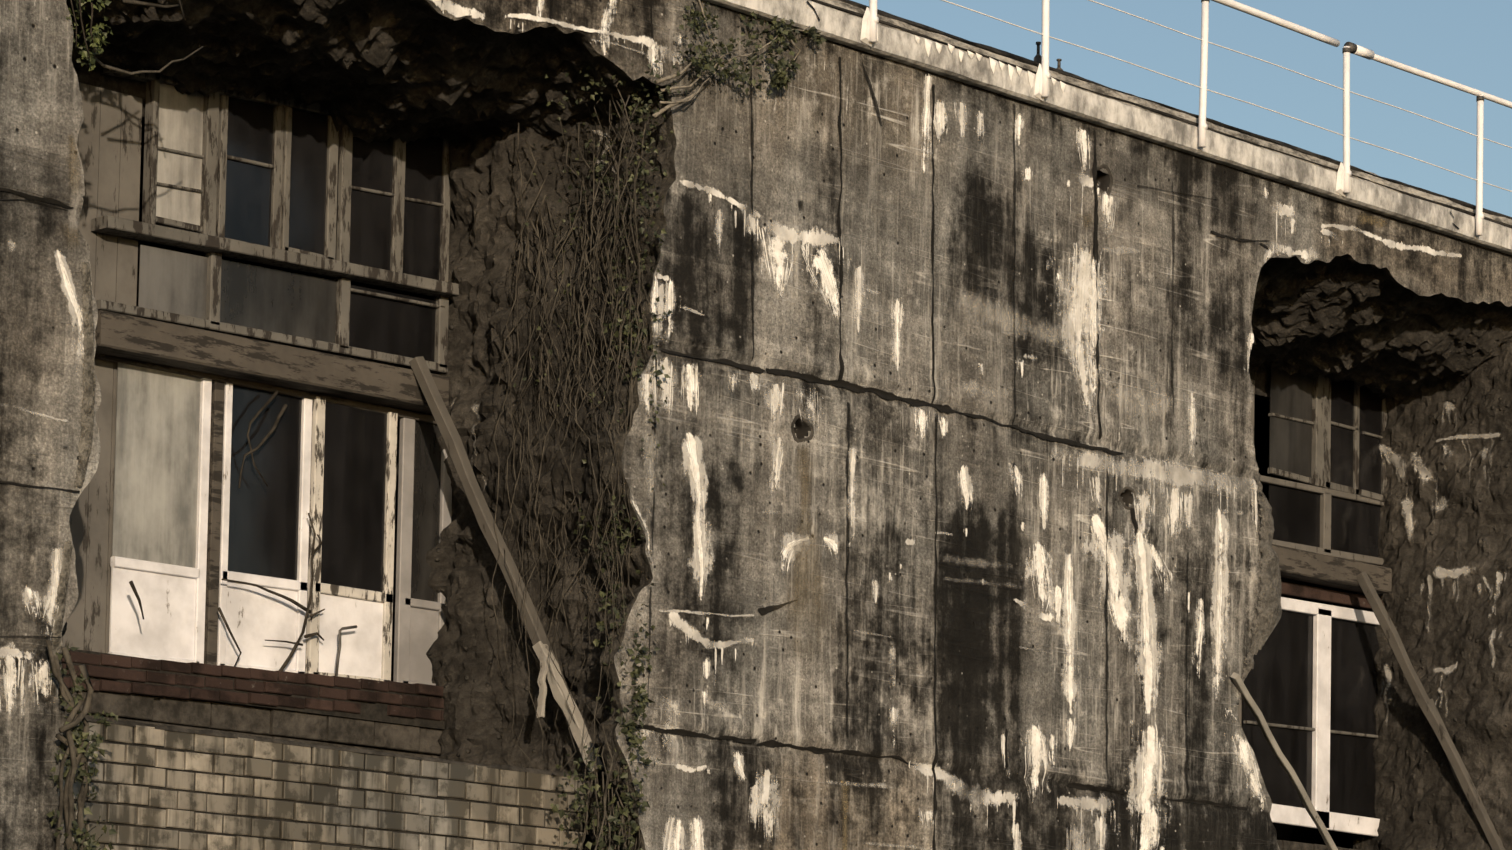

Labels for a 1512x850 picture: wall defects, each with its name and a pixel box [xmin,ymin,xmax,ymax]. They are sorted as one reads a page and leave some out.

crack [0,188,74,211]
efflorescence [708,188,861,332]
spalling [64,262,96,488]
efflorescence [640,358,699,415]
water stain [1056,243,1101,409]
crack [0,481,80,493]
crack [0,632,61,640]
spalling [4,540,73,698]
efflorescence [669,612,736,710]
water stain [1014,453,1265,850]
crack [631,725,1006,850]
crack [1068,783,1247,810]